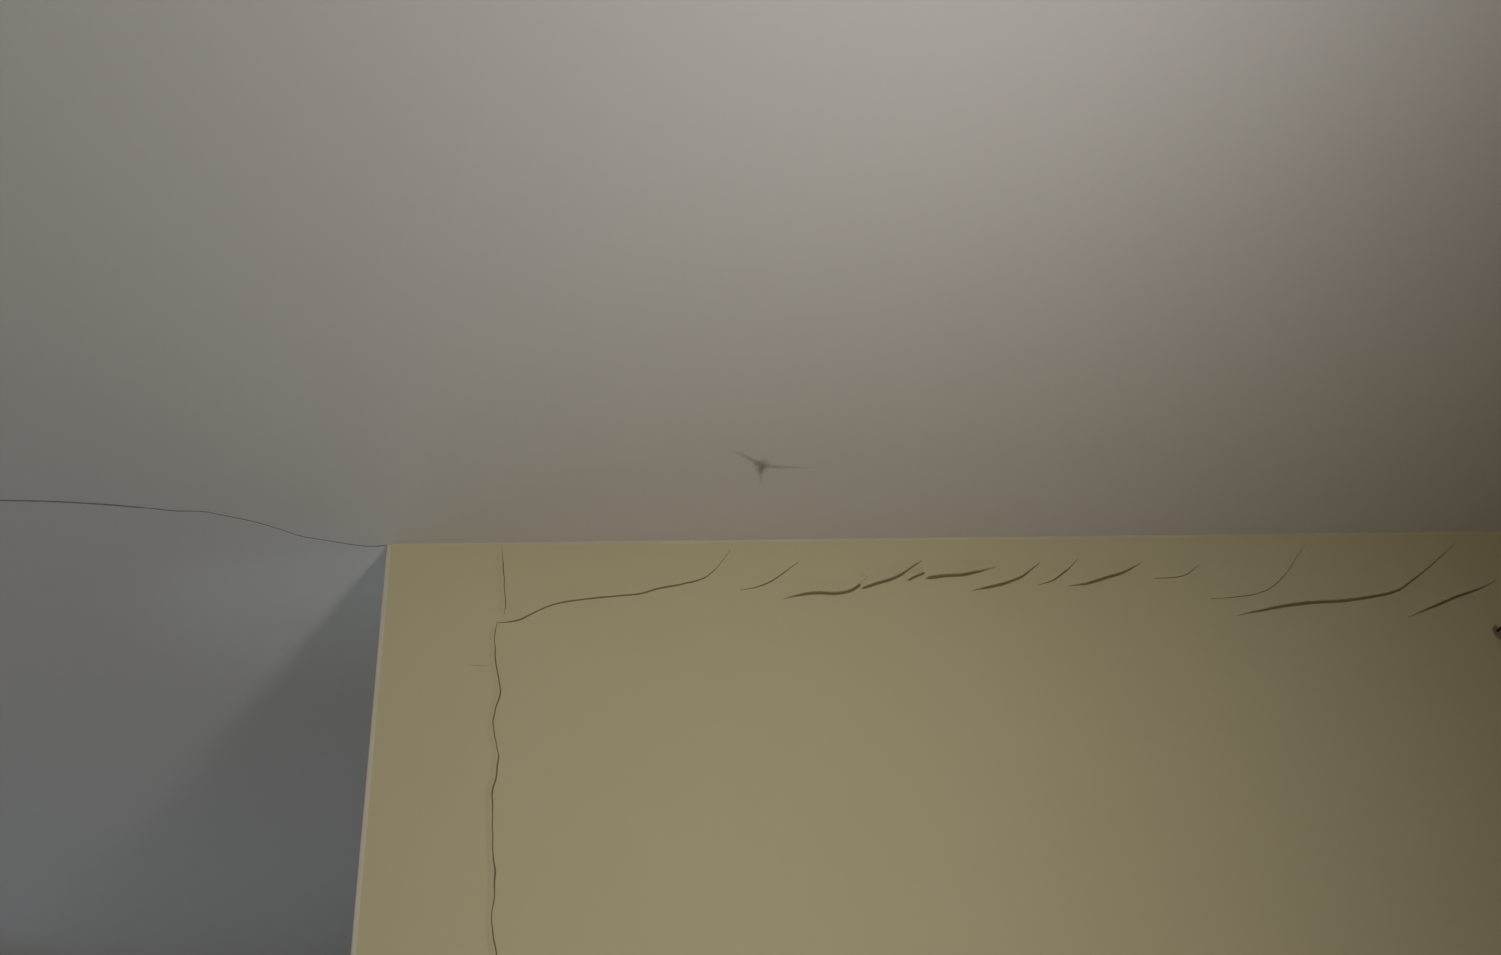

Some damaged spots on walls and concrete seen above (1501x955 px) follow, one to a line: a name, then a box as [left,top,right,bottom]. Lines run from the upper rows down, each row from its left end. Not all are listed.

crack [0,500,387,629]
crack [484,546,730,955]